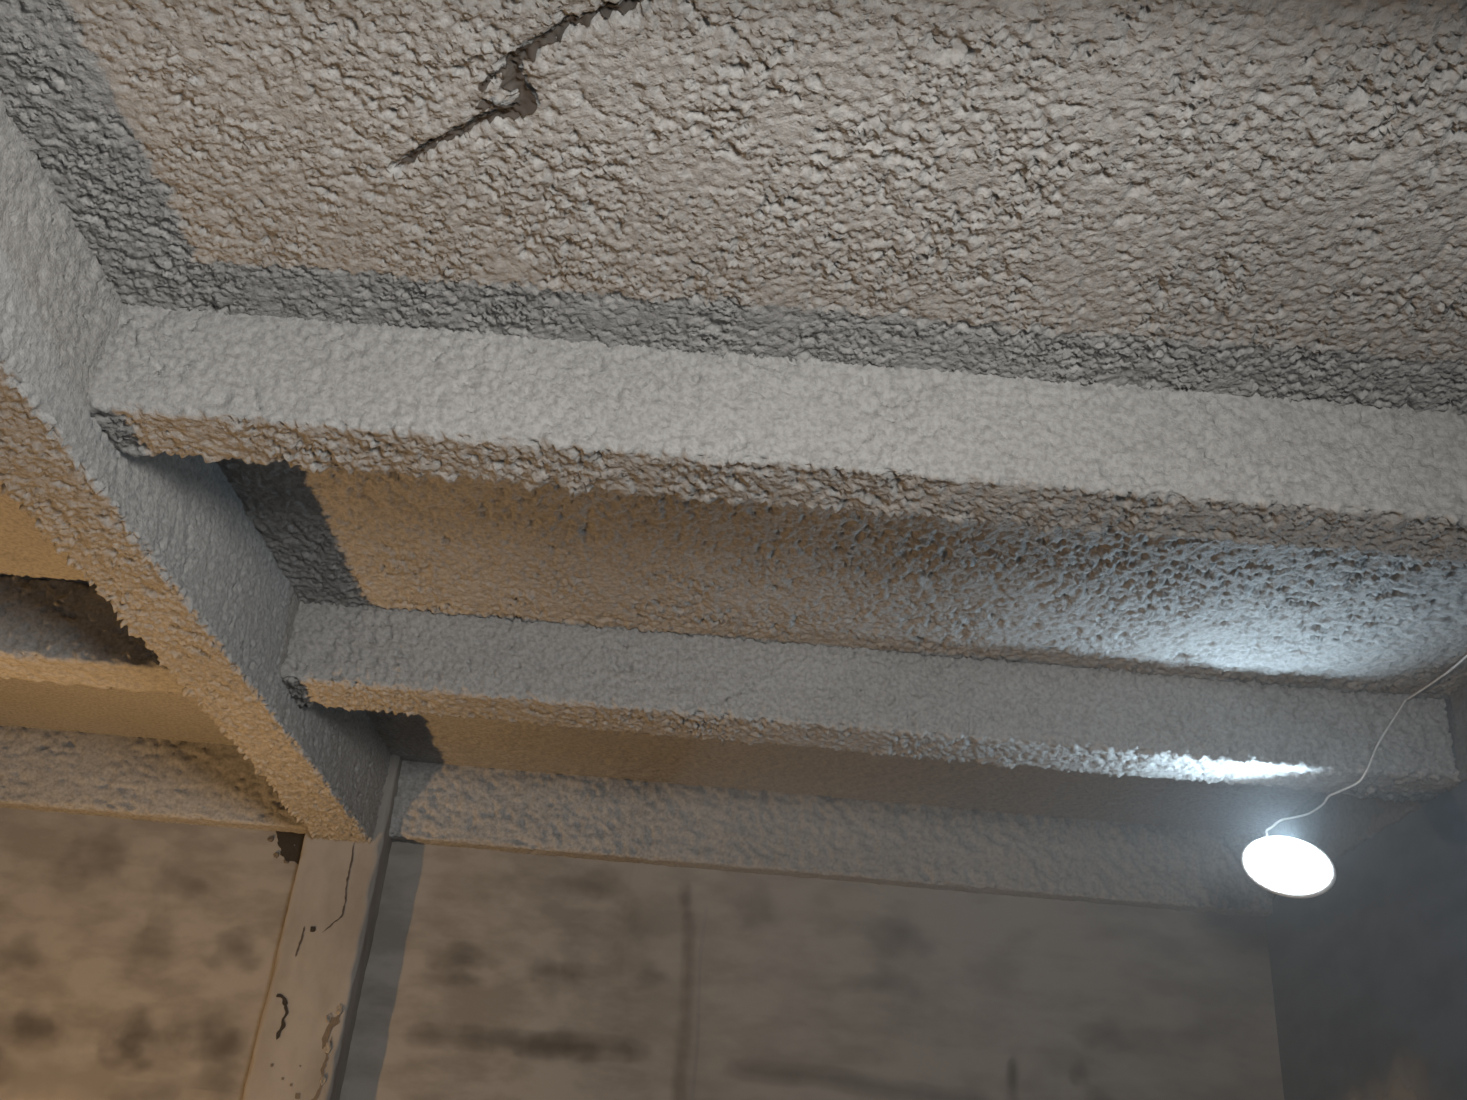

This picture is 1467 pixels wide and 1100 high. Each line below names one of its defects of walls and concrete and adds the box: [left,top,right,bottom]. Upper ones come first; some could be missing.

crack [395,0,644,167]